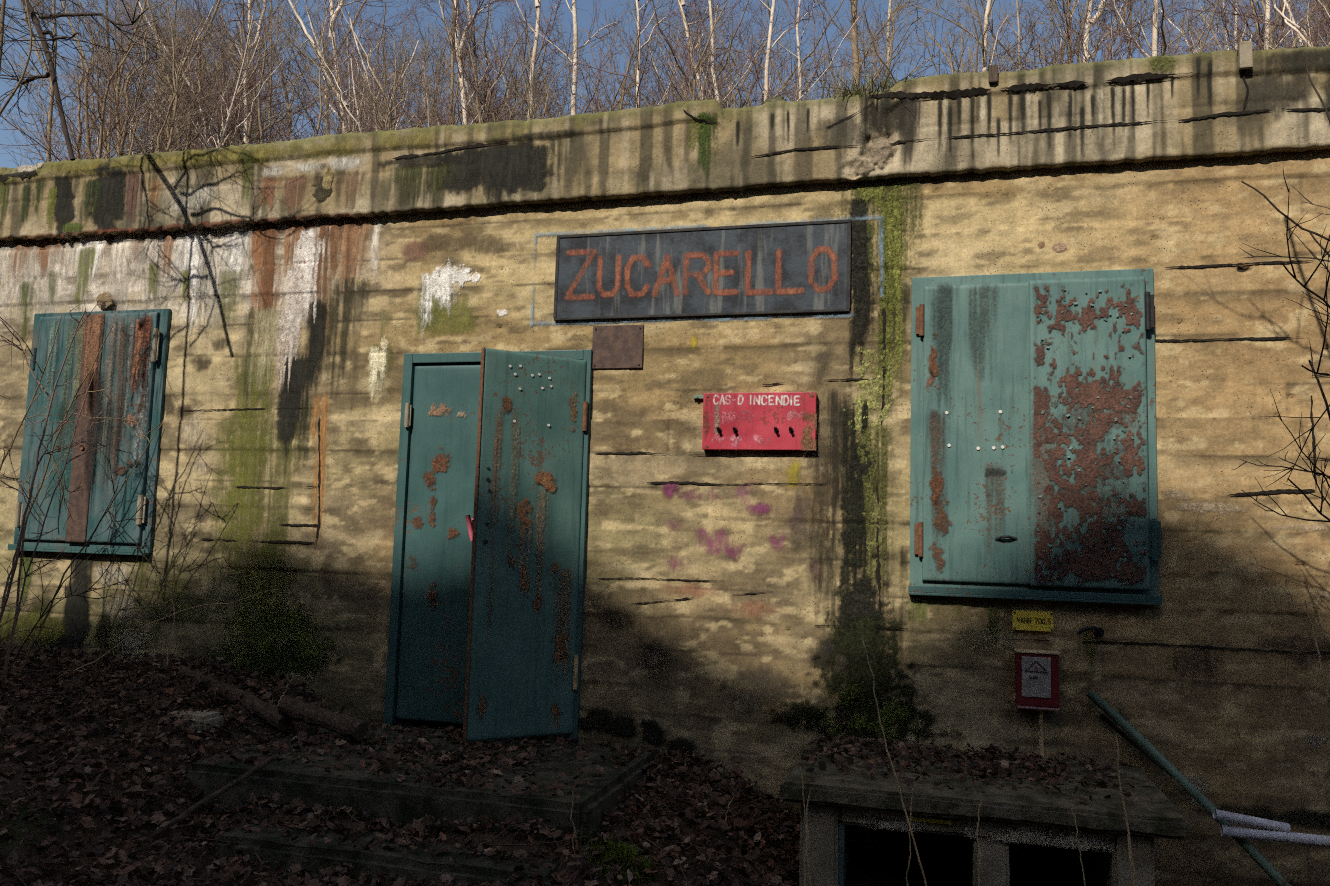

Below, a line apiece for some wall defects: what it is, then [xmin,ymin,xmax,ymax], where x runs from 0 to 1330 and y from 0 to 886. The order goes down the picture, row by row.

leakage [0,176,261,336]
rust [14,172,371,342]
leakage [241,150,360,200]
leakage [394,163,451,202]
leakage [468,139,561,202]
leakage [862,89,920,156]
leakage [938,81,1149,151]
leakage [1197,57,1212,101]
rust [47,314,151,504]
leakage [216,217,380,597]
rust [492,396,571,672]
leakage [810,392,927,686]